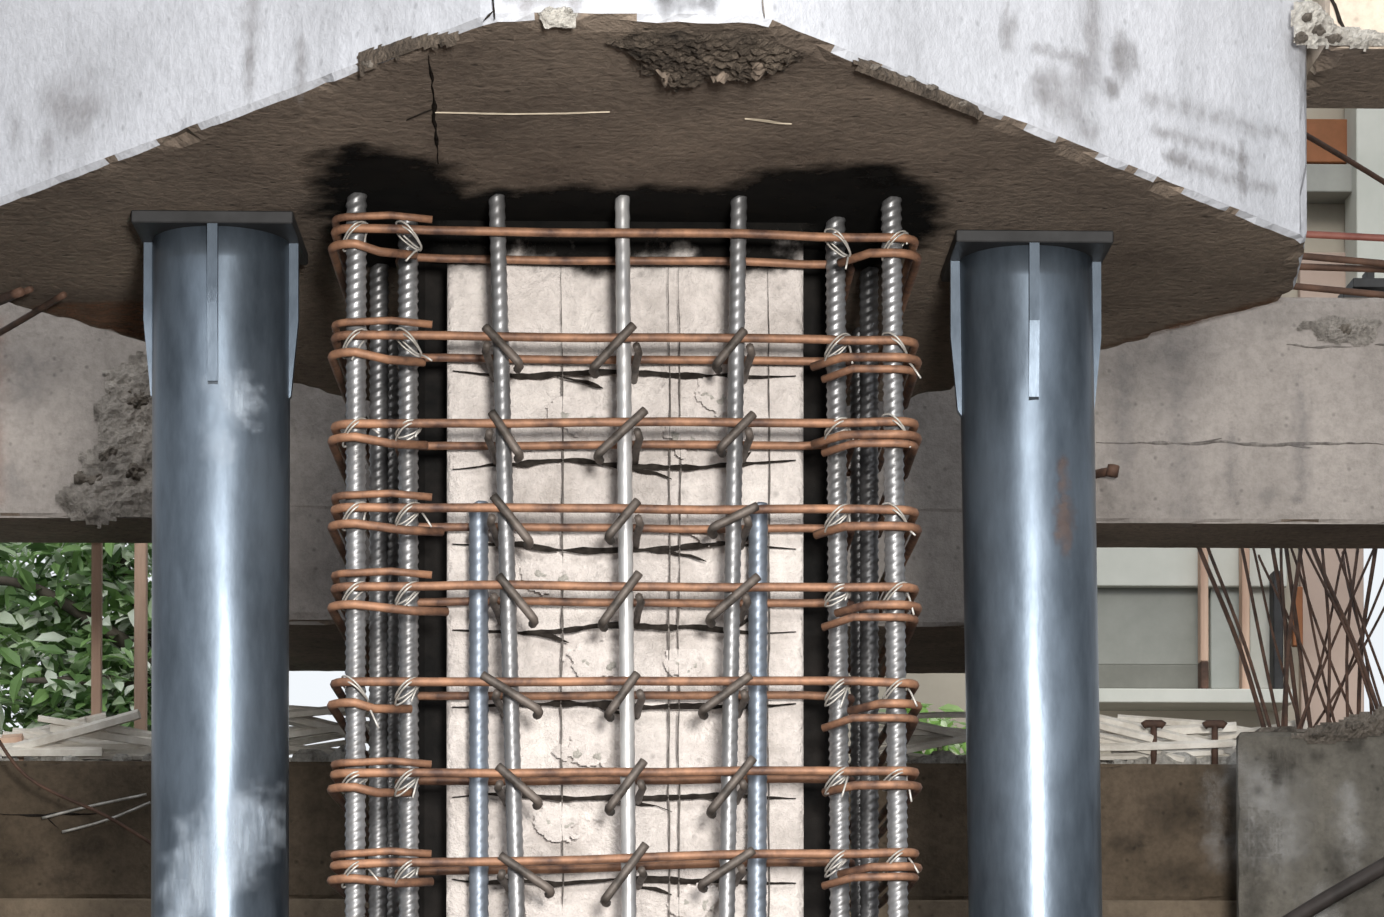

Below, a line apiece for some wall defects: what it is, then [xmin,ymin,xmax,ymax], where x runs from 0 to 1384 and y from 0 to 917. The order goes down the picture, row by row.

spalling [1291,0,1384,52]
spalling [663,376,728,459]
spalling [55,351,152,529]
crack [453,452,796,479]
crack [452,537,796,562]
spalling [520,552,576,595]
crack [452,618,796,643]
crack [452,699,796,719]
crack [452,792,796,812]
spalling [533,802,581,842]
crack [452,869,796,895]
spalling [667,883,719,917]